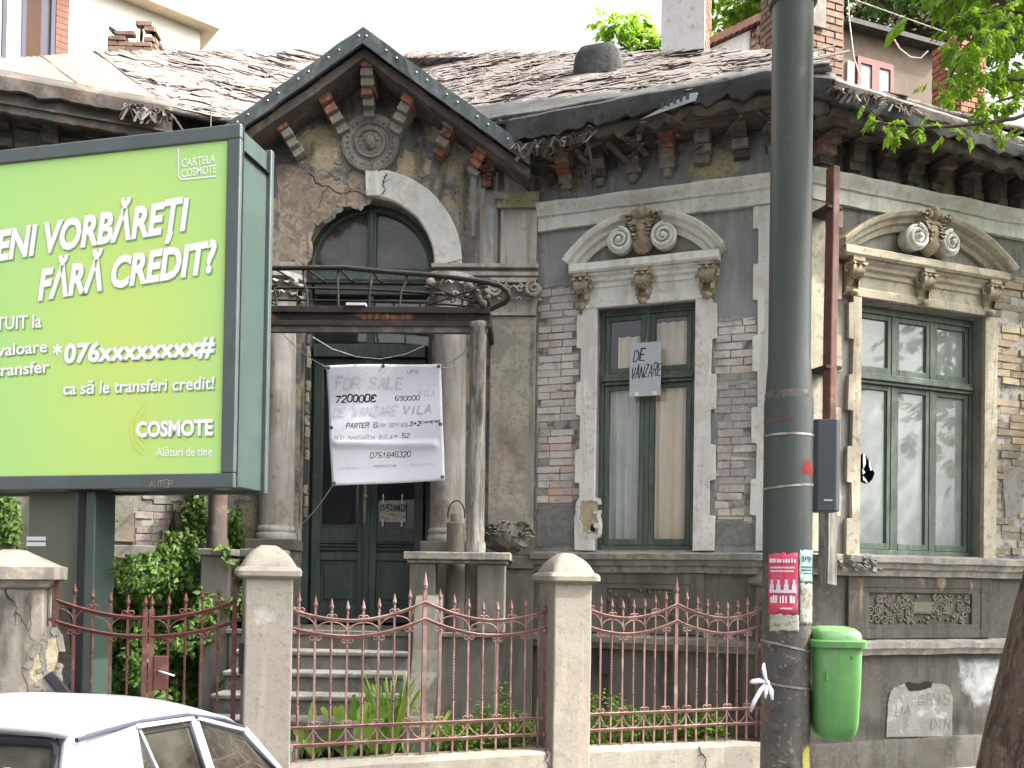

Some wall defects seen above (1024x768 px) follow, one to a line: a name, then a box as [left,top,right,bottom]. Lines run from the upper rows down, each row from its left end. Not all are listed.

crack [308,173,389,211]
spalling [662,143,746,184]
flaking render [533,281,603,539]
flaking render [710,316,758,525]
flaking render [993,273,1024,559]
crack [5,589,35,642]
spalling [23,627,66,693]